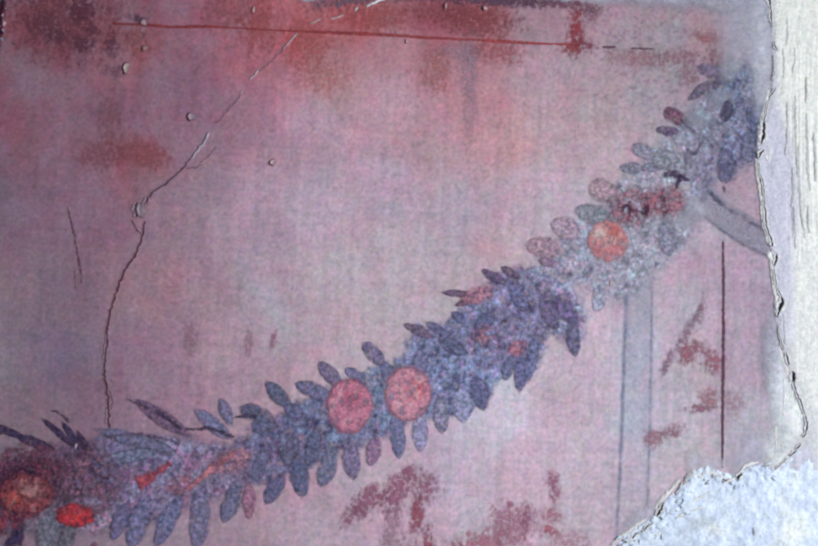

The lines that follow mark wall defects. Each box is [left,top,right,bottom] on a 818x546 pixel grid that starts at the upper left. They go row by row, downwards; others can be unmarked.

crack [102,0,383,445]
flaking render [613,0,818,546]